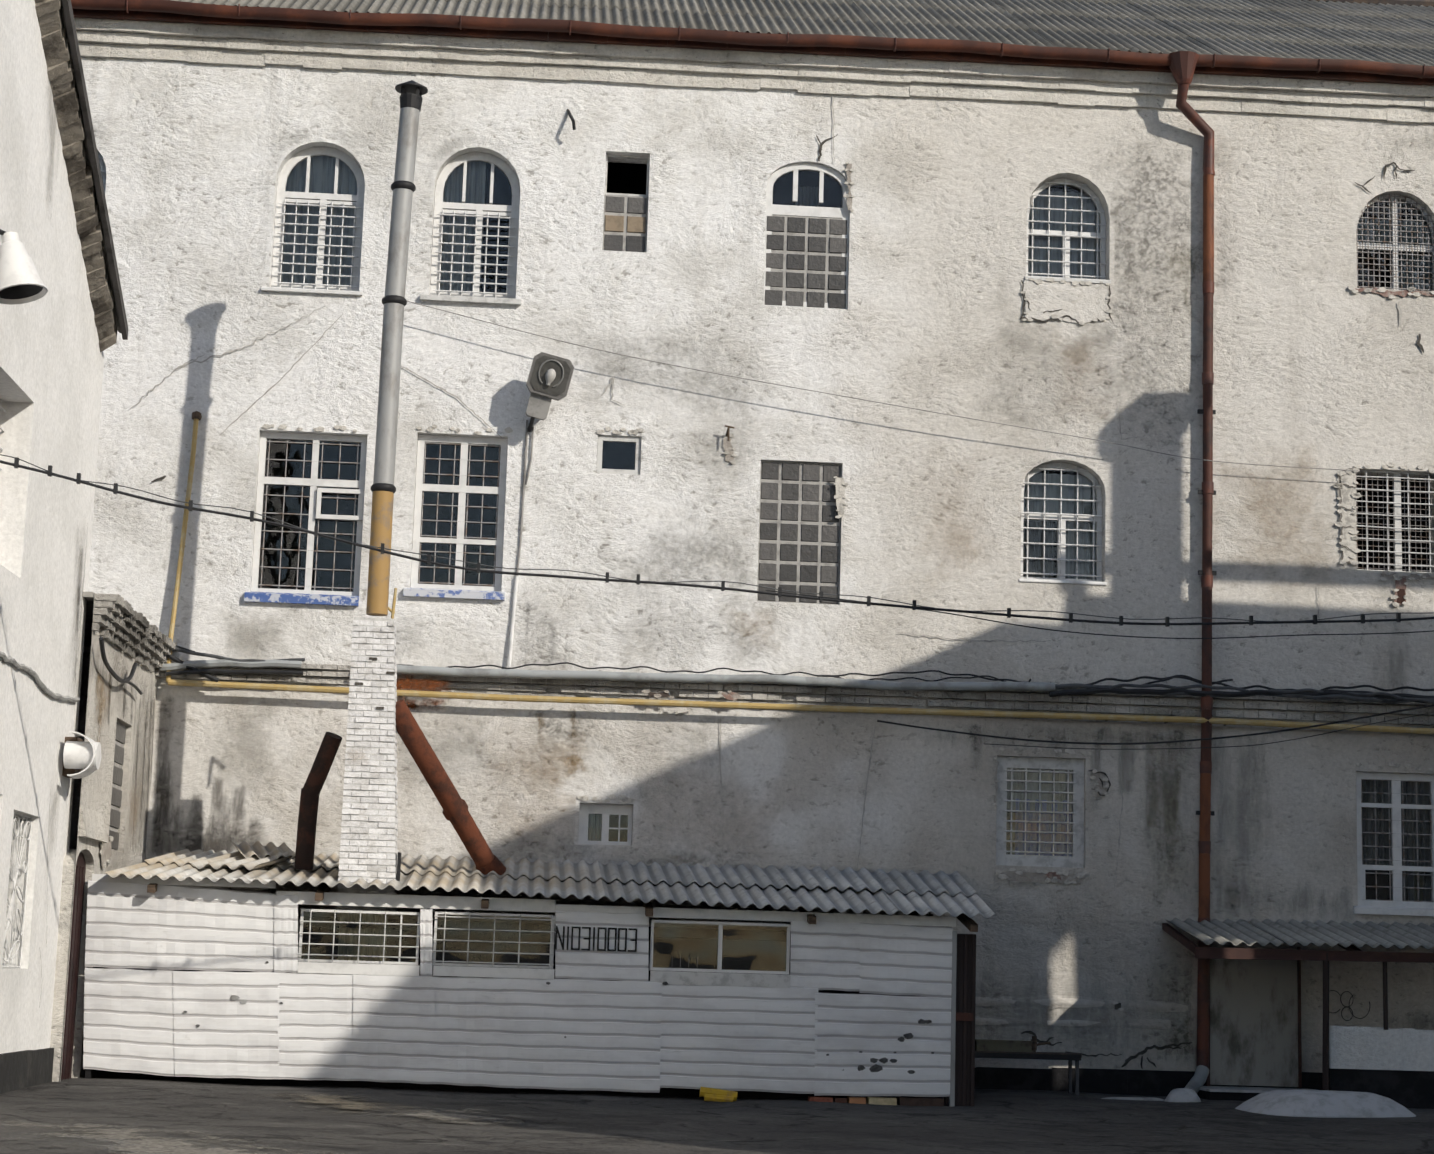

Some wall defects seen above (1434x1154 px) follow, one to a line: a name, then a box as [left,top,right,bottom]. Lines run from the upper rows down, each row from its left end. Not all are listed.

peeling [1020,278,1112,325]
spalling [1333,462,1434,566]
spalling [1380,570,1434,607]
corrosion [396,675,447,710]
damp [155,784,255,853]